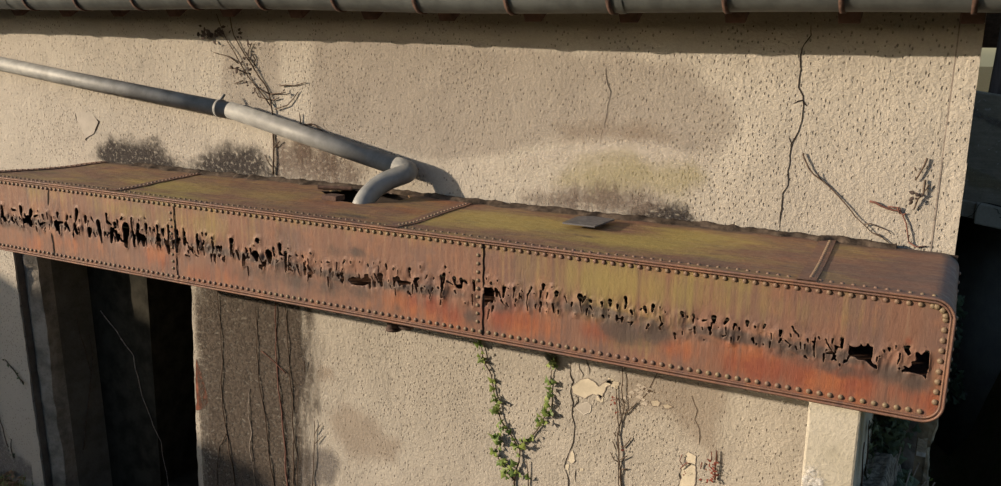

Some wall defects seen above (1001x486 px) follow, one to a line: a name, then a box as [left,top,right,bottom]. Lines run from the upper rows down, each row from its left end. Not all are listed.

crack [779,33,812,229]
damp [98,139,178,167]
damp [196,142,356,183]
damp [549,187,693,221]
damp [195,287,336,486]
peeling [572,378,672,415]
peeling [678,451,696,486]